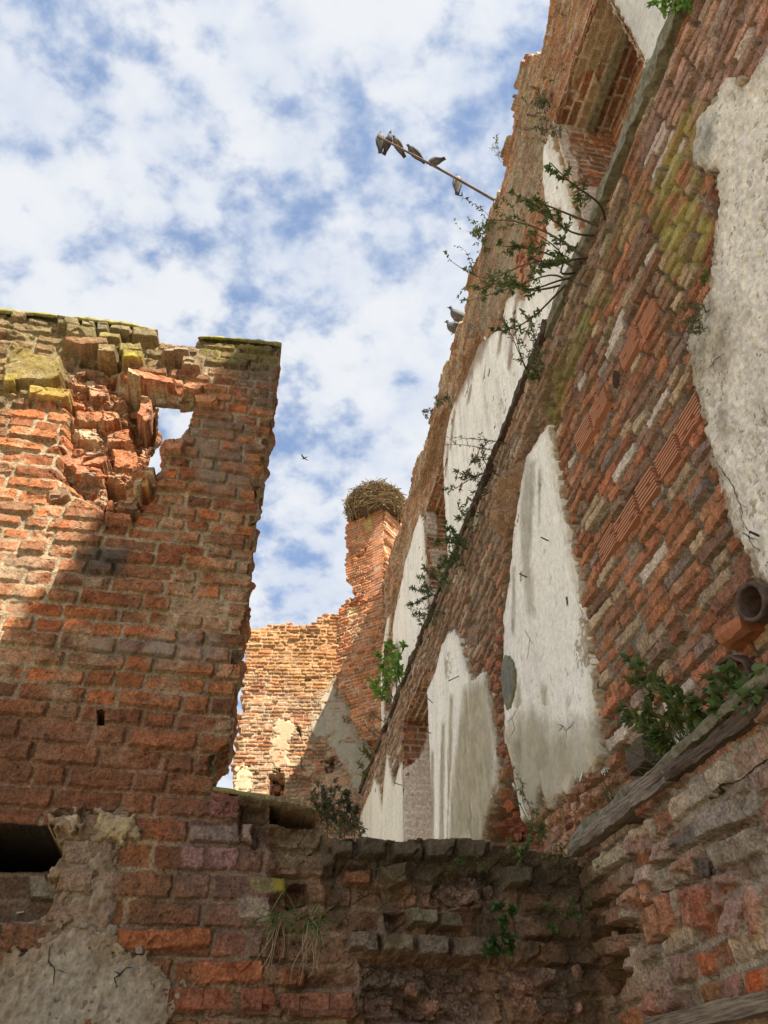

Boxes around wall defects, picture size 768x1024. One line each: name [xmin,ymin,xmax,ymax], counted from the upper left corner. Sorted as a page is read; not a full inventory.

spalling [60,368,162,514]
crack [715,459,760,551]
flaking render [267,673,410,842]
flaking render [0,794,189,1024]